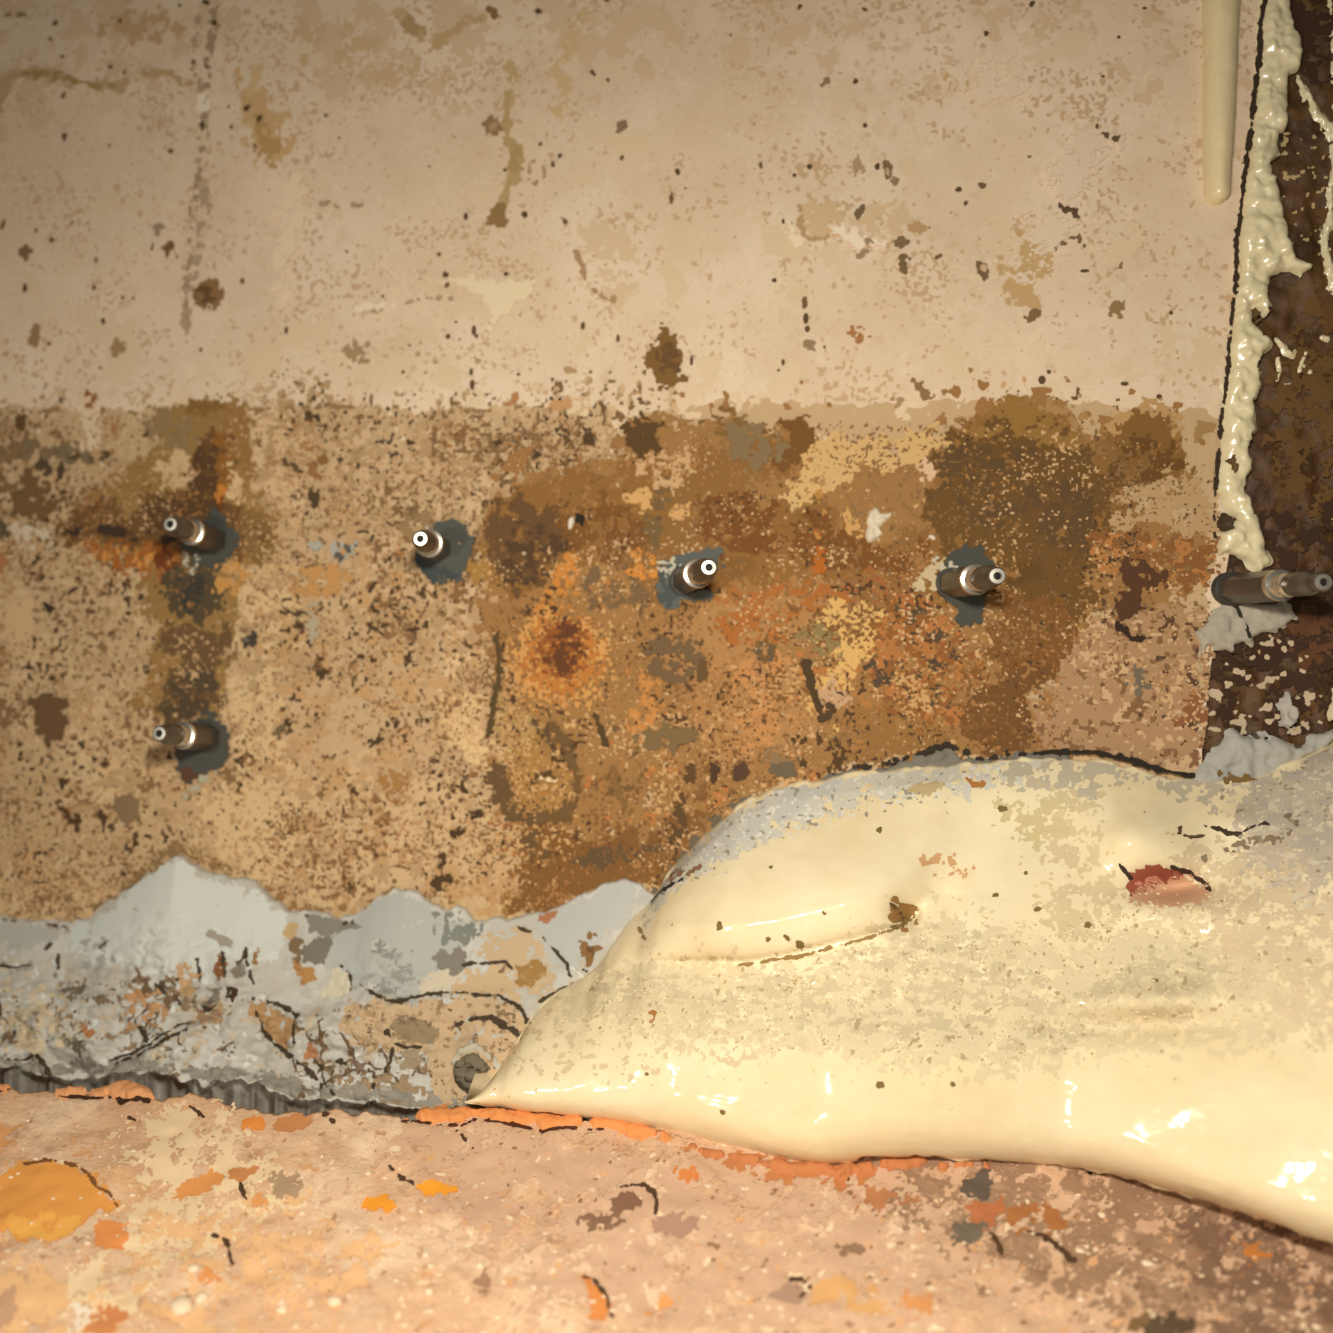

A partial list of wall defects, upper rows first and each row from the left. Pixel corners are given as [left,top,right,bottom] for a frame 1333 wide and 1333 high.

rust [1259,198,1333,527]
leakage [0,408,113,542]
leakage [619,410,665,459]
leakage [711,406,819,487]
leakage [0,693,69,745]
rust [52,393,285,724]
leakage [150,562,235,725]
rust [471,390,1225,918]
leakage [1110,556,1169,642]
rust [1266,604,1333,674]
leakage [424,689,866,915]
crack [322,1111,336,1124]